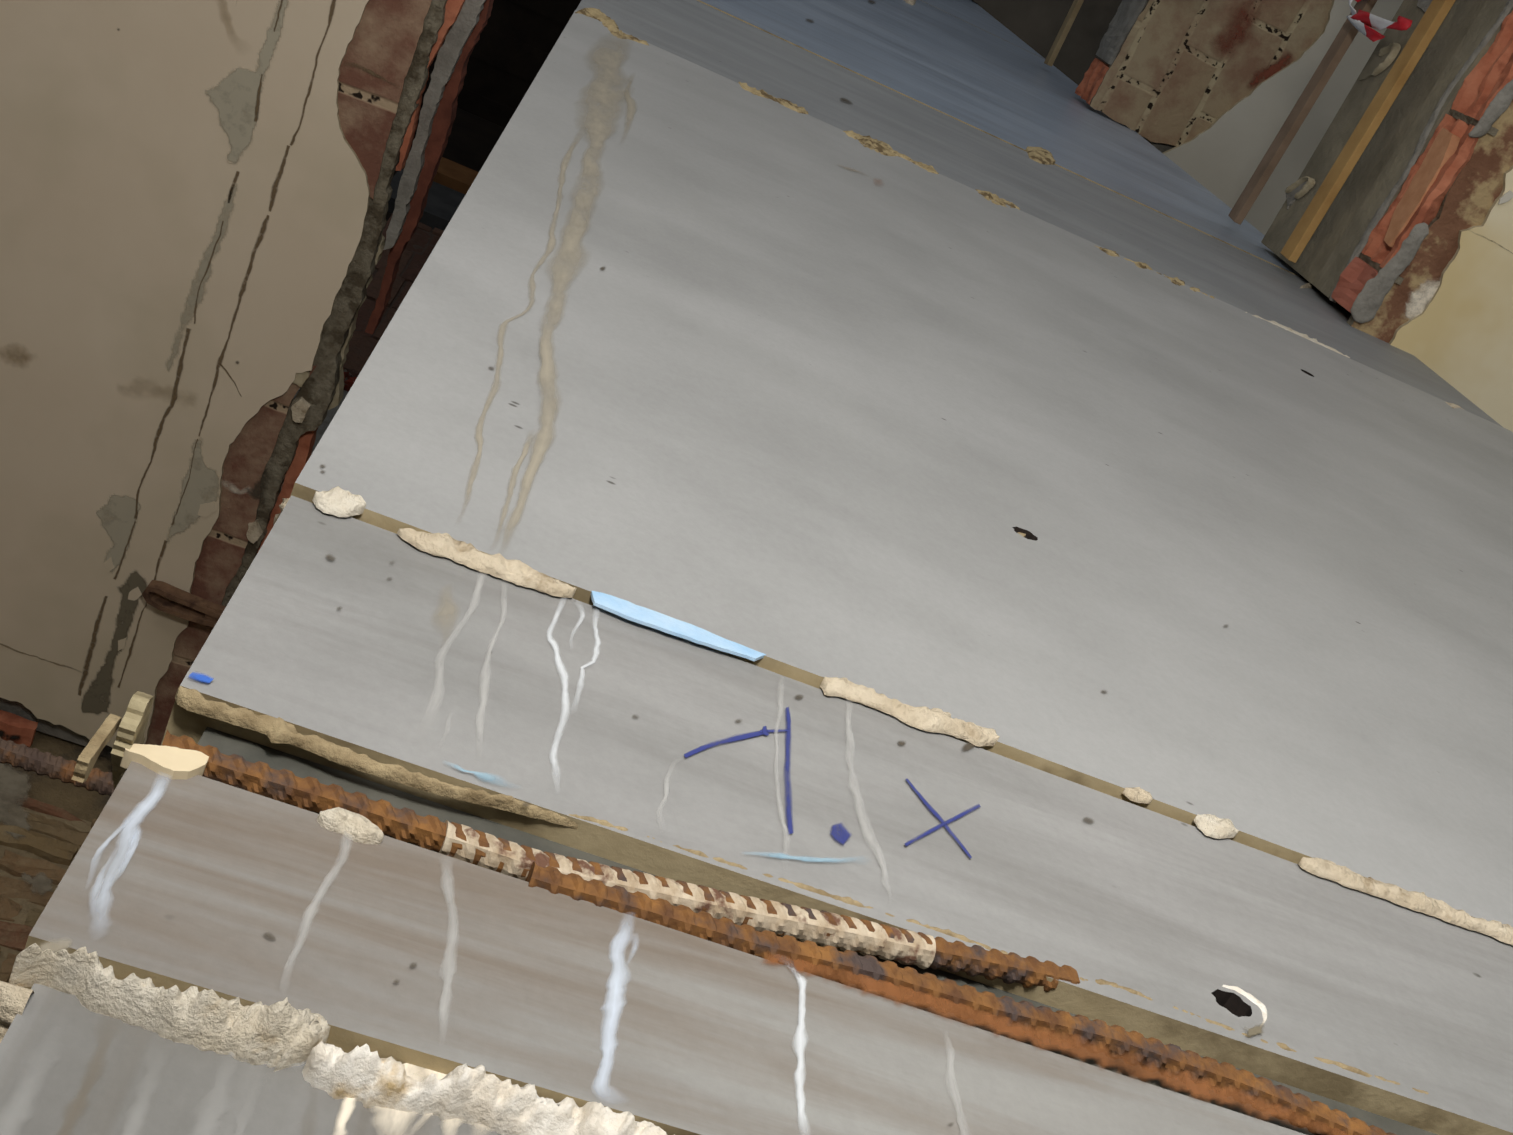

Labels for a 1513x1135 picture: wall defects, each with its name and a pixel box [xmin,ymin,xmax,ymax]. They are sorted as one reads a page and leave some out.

spalling [1329,0,1513,343]
crack [0,0,336,696]
spalling [167,0,494,606]
flaking render [145,621,214,746]
water stain [548,612,600,765]
water stain [336,1097,355,1135]
water stain [403,1063,447,1082]
water stain [596,932,626,1089]
rust [767,954,823,973]
water stain [791,966,805,1121]
rust [850,973,1304,1123]
spalling [1222,985,1267,1036]